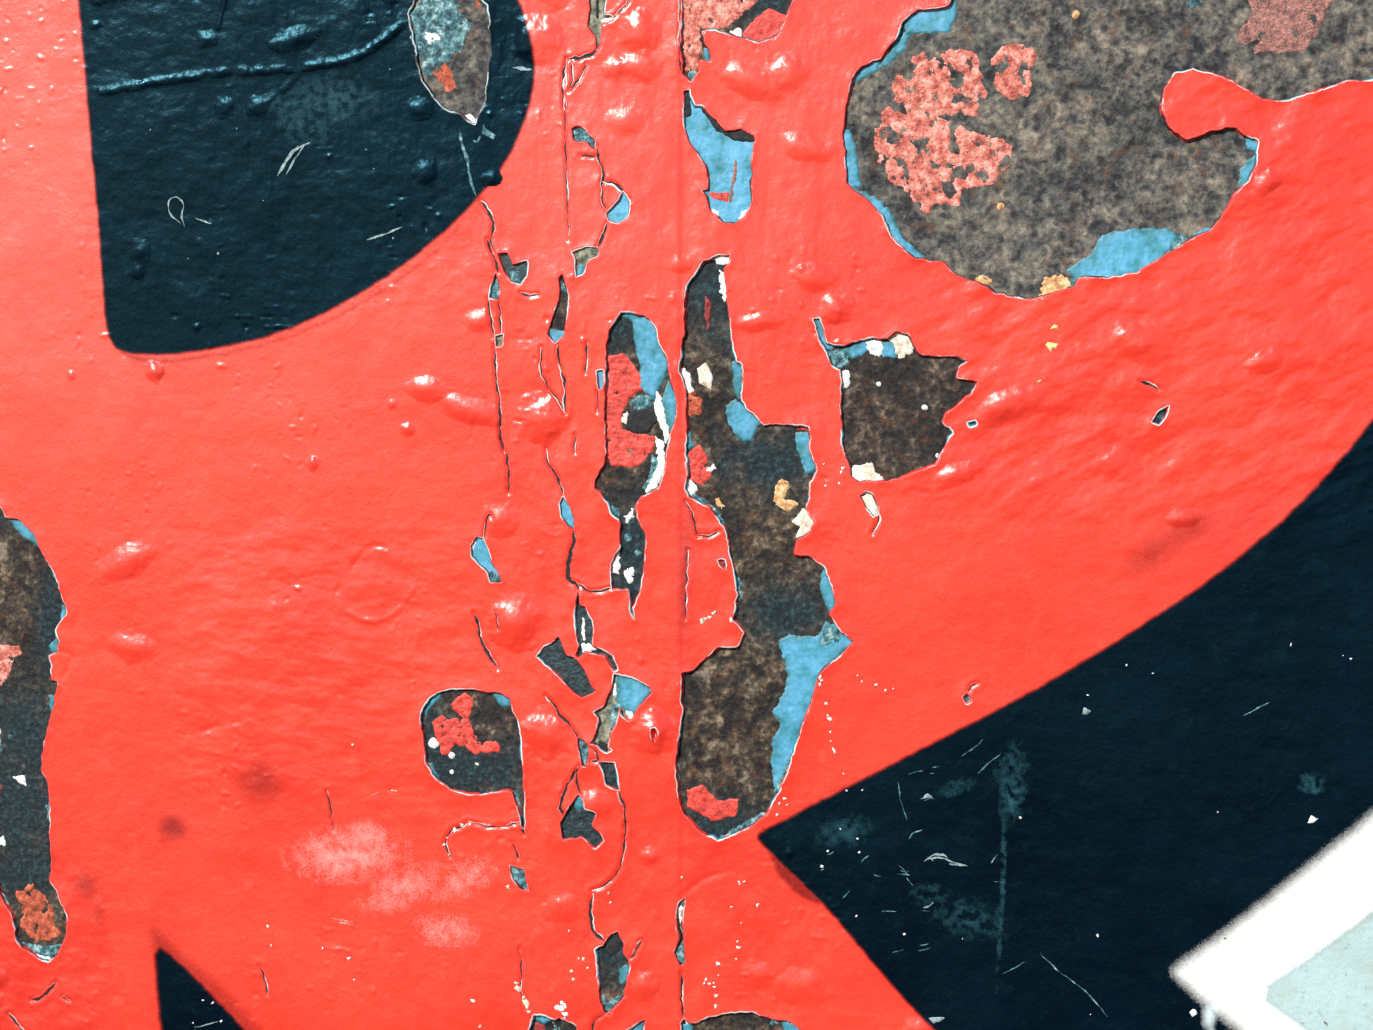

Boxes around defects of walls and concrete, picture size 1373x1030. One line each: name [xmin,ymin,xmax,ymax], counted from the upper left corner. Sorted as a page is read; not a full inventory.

peeling [679,0,795,226]
peeling [841,0,1373,301]
crack [481,200,538,537]
crack [538,342,601,495]
peeling [812,316,979,519]
peeling [0,506,68,964]
peeling [419,687,527,829]
crack [474,611,500,668]
crack [545,696,599,816]
crack [566,530,610,592]
peeling [593,253,855,842]
crack [588,791,641,958]